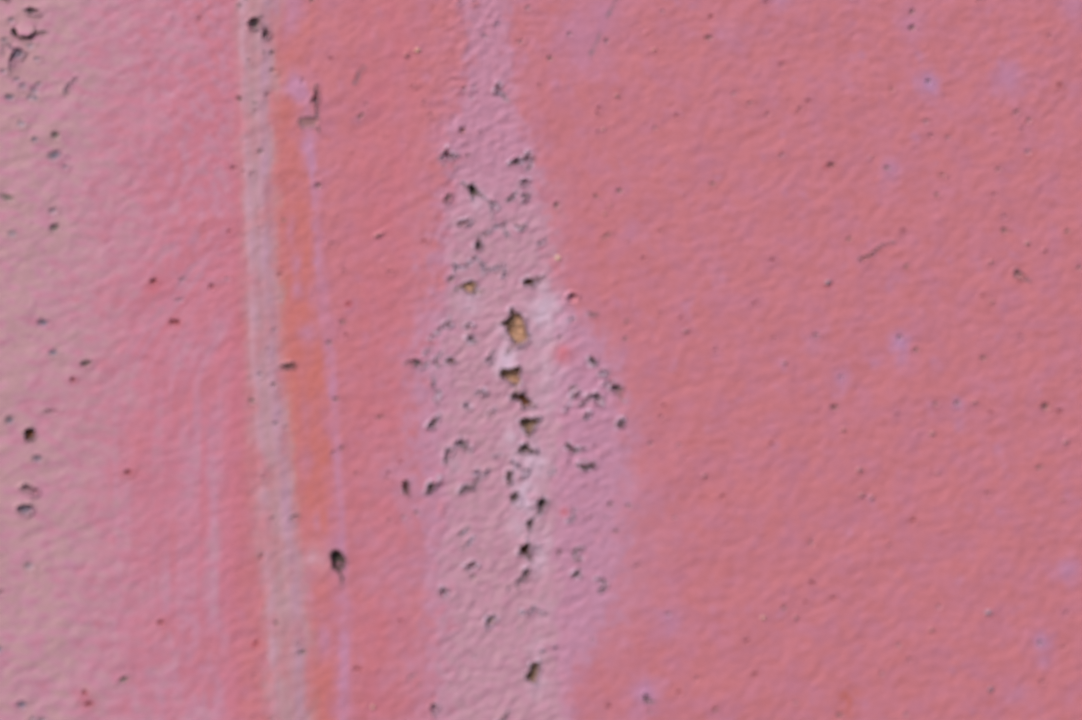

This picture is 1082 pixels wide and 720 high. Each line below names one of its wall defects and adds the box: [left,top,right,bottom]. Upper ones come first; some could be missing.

peeling [507,149,533,204]
peeling [455,217,484,252]
peeling [444,274,486,296]
peeling [520,274,546,288]
peeling [402,355,457,370]
peeling [483,305,541,455]
peeling [568,354,626,420]
peeling [382,468,411,496]
peeling [424,437,474,496]
peeling [562,441,601,471]
peeling [504,469,552,585]
peeling [524,659,541,686]